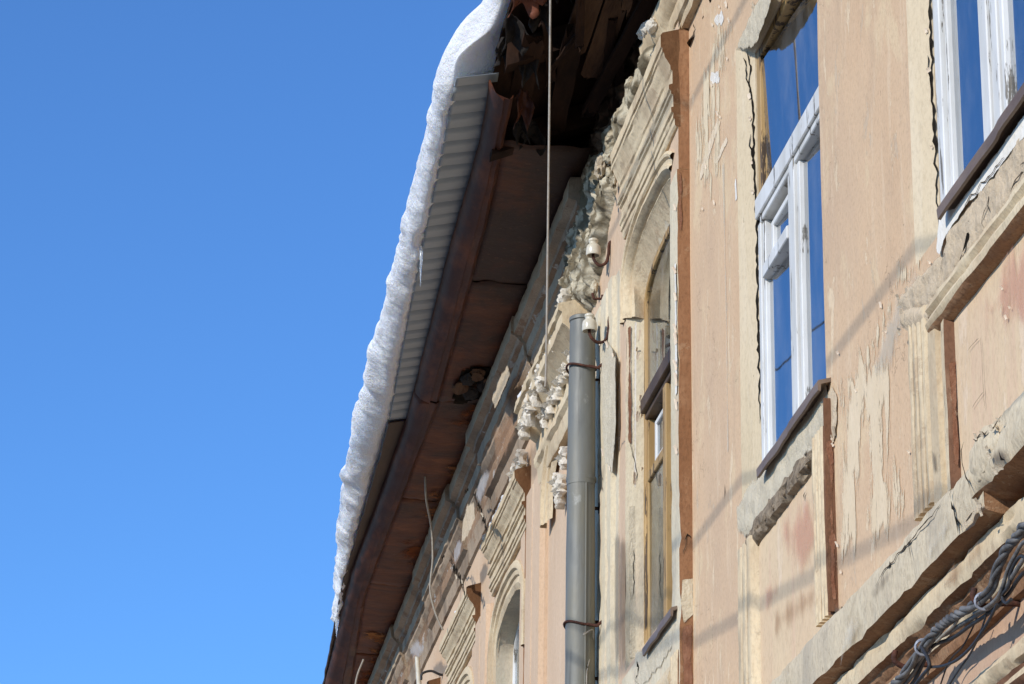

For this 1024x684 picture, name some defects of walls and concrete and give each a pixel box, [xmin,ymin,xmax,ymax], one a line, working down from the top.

spalling [558,0,659,313]
peeling [687,0,771,210]
crack [743,54,761,424]
peeling [737,138,1024,574]
crack [877,339,1001,583]
crack [924,0,1024,274]